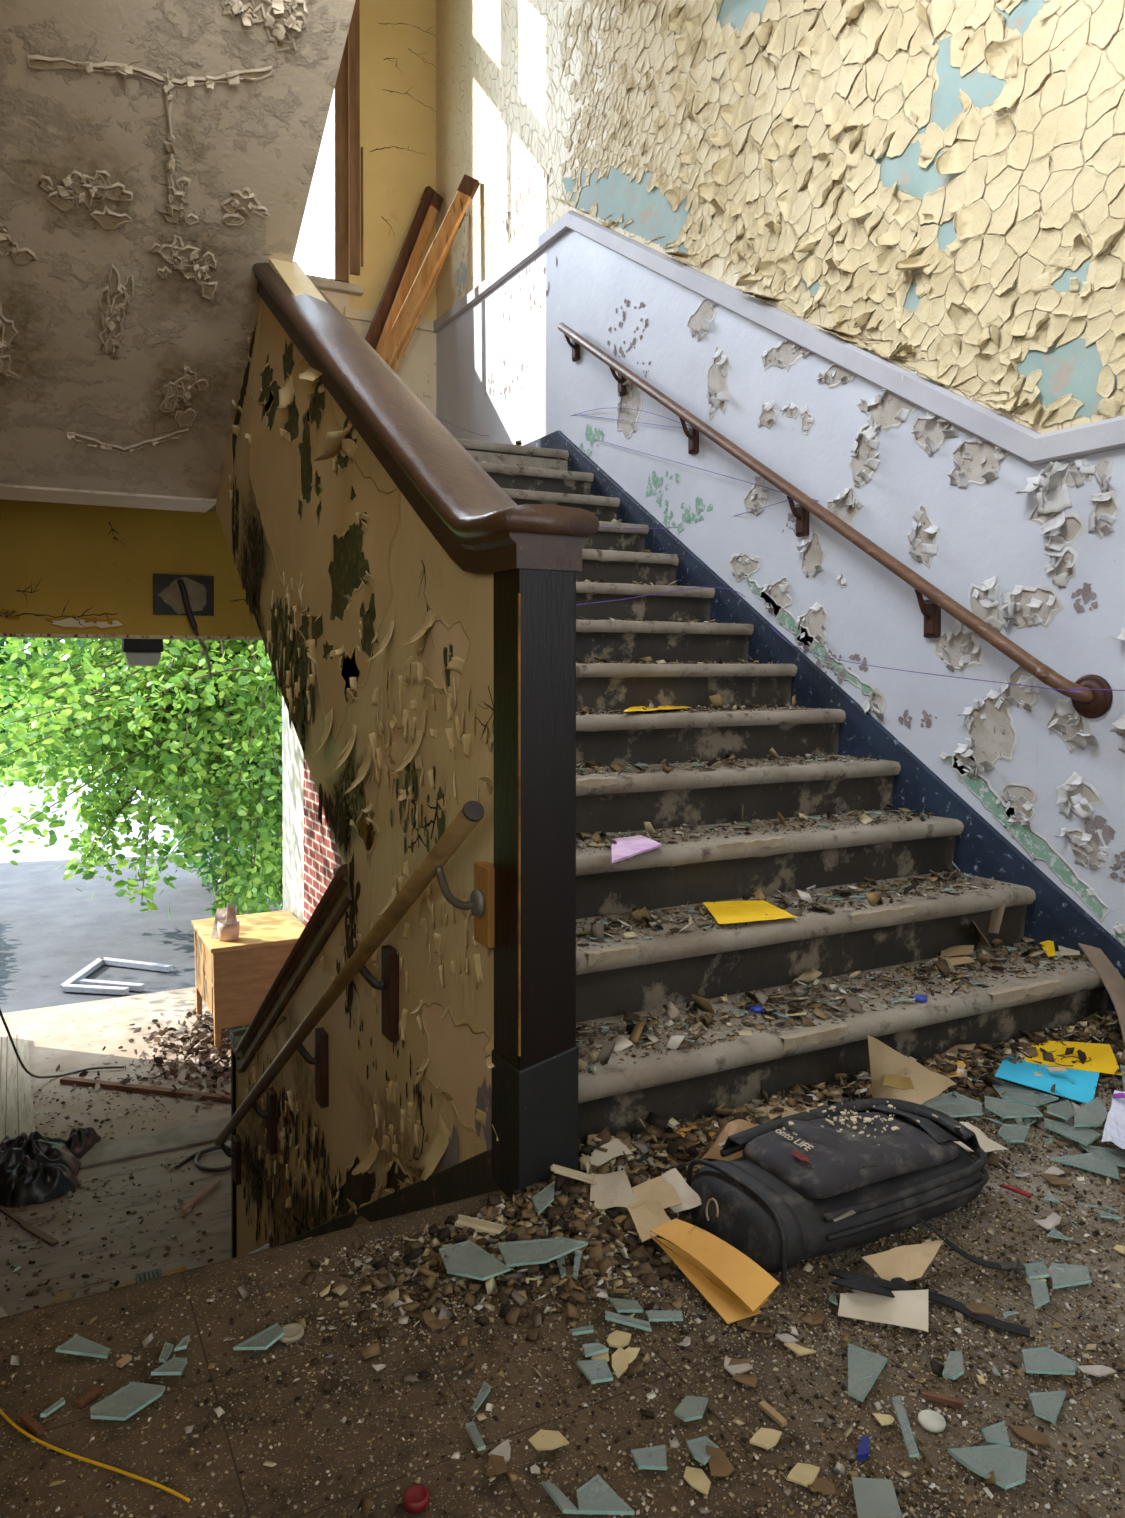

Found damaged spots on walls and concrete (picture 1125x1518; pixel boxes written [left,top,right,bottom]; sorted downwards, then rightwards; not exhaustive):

peeling [485,0,1125,532]
peeling [729,512,937,729]
peeling [906,502,941,570]
peeling [933,456,1121,672]
peeling [245,302,499,1220]
spalling [849,904,915,924]
peeling [939,665,1125,946]